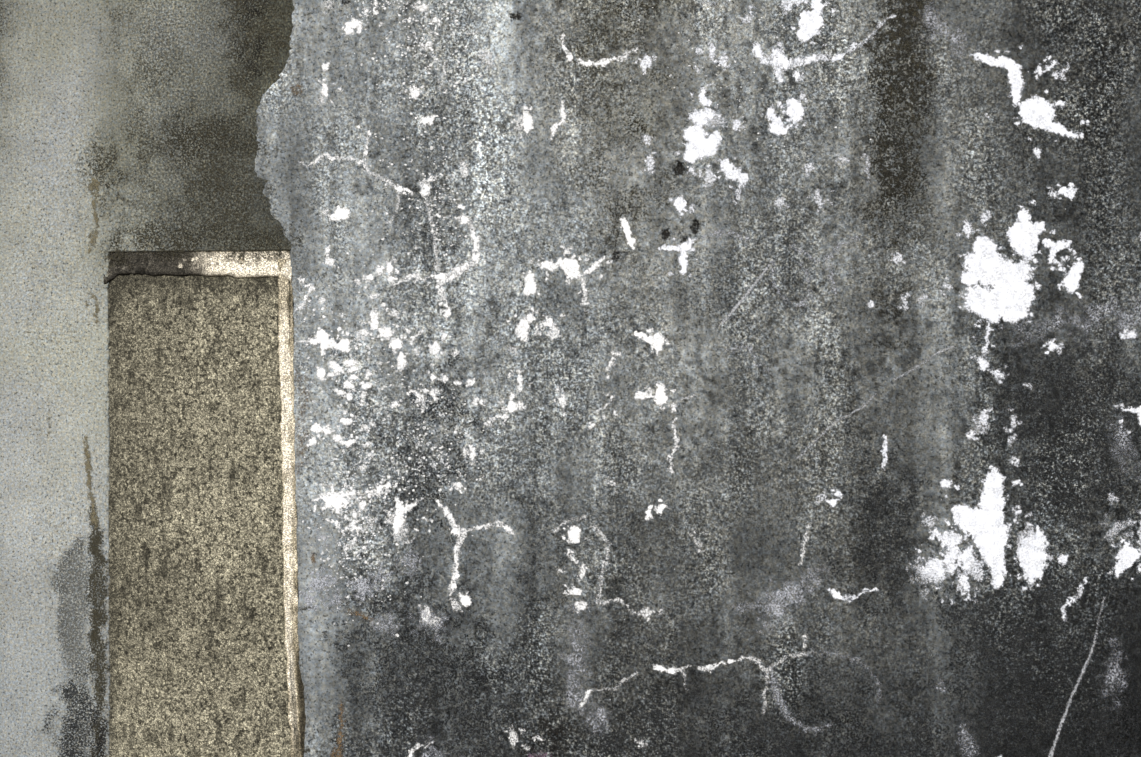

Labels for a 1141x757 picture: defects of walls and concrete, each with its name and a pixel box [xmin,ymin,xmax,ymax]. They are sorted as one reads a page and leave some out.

damp [79,0,301,267]
damp [34,504,112,757]
crack [436,500,514,596]
crack [580,635,806,707]
damp [322,302,1141,757]
crack [1061,577,1087,618]